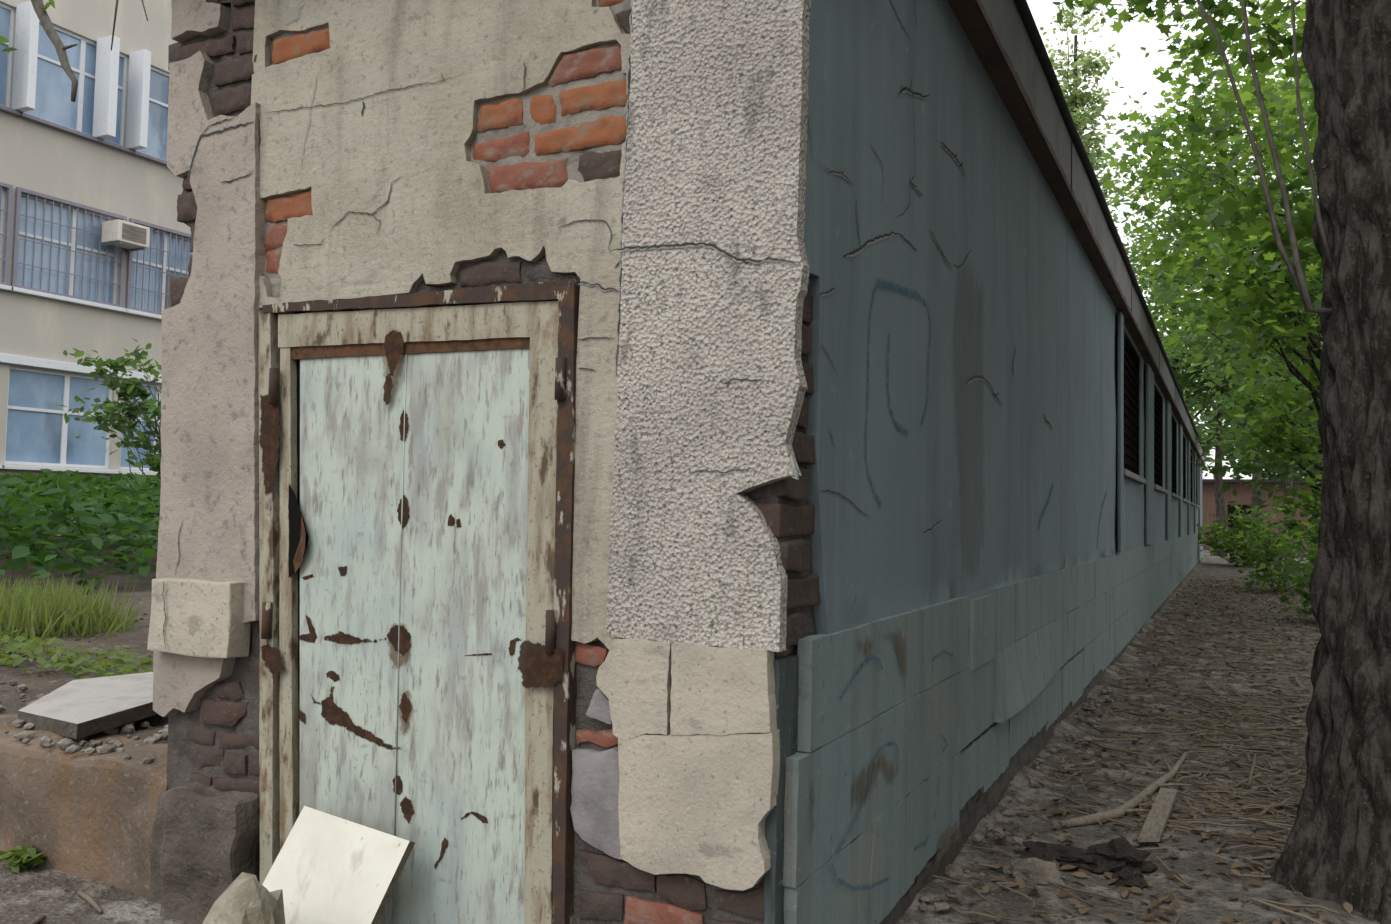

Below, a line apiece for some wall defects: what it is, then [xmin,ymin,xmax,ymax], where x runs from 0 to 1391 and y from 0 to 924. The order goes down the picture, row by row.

spalling [168,0,330,117]
crack [188,73,464,183]
spalling [470,0,632,193]
crack [293,176,402,246]
crack [558,0,801,376]
crack [808,119,971,297]
rust [382,330,409,442]
spalling [745,281,821,657]
rust [298,671,411,751]
rust [299,615,411,667]
rust [508,638,564,690]
flaking render [579,849,765,924]